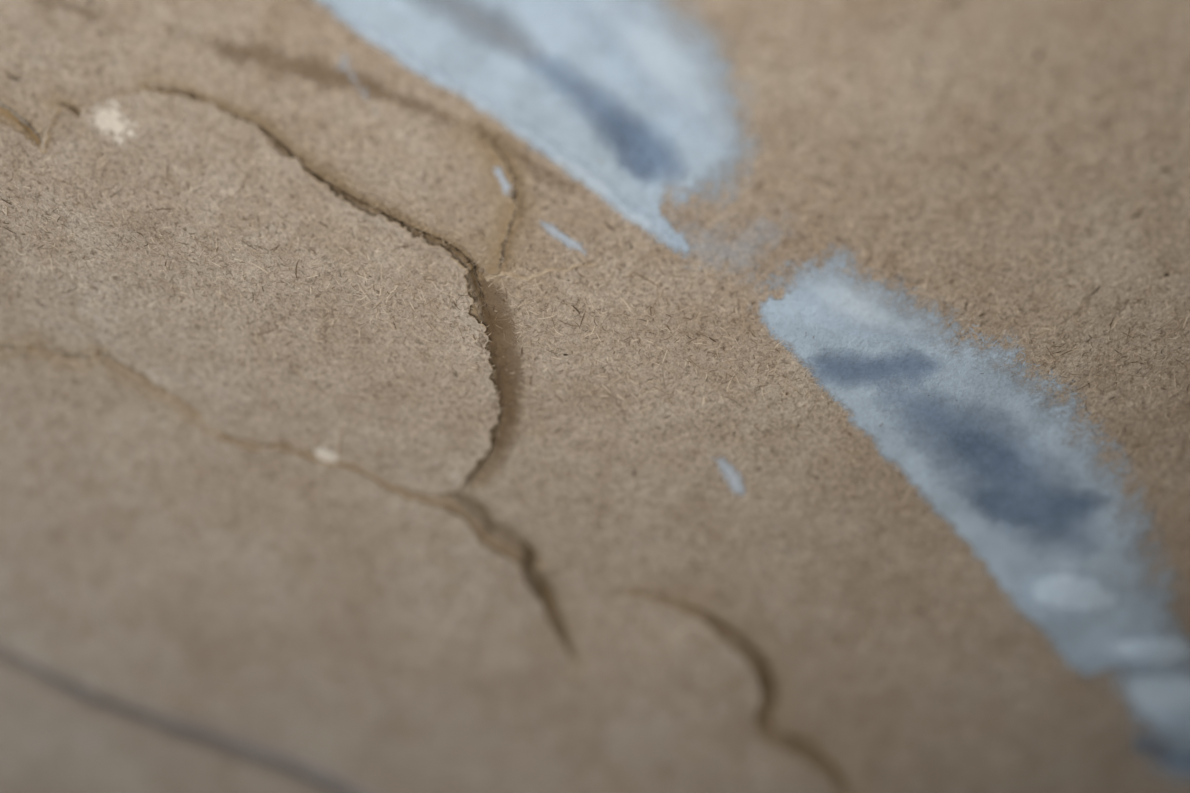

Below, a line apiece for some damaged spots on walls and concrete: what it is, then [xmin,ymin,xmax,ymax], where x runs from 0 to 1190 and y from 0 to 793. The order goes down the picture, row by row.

crack [0,103,42,147]
crack [61,104,80,118]
crack [99,352,197,414]
crack [149,85,577,662]
crack [636,592,849,793]